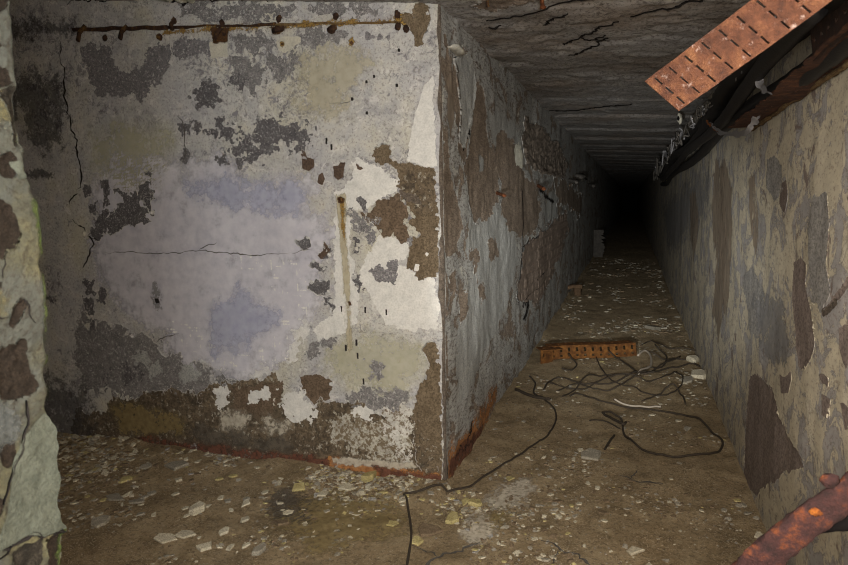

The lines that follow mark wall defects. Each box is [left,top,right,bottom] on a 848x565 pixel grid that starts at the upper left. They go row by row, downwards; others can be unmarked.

corrosion [269,13,406,47]
crack [486,0,586,30]
crack [563,0,703,56]
spalling [0,43,27,181]
crack [59,41,310,267]
spalling [0,198,22,261]
peeling [71,0,583,480]
corrosion [336,193,352,351]
corrosion [711,159,732,340]
spalling [0,338,39,403]
flaking render [0,413,67,565]
corrosion [128,384,497,480]